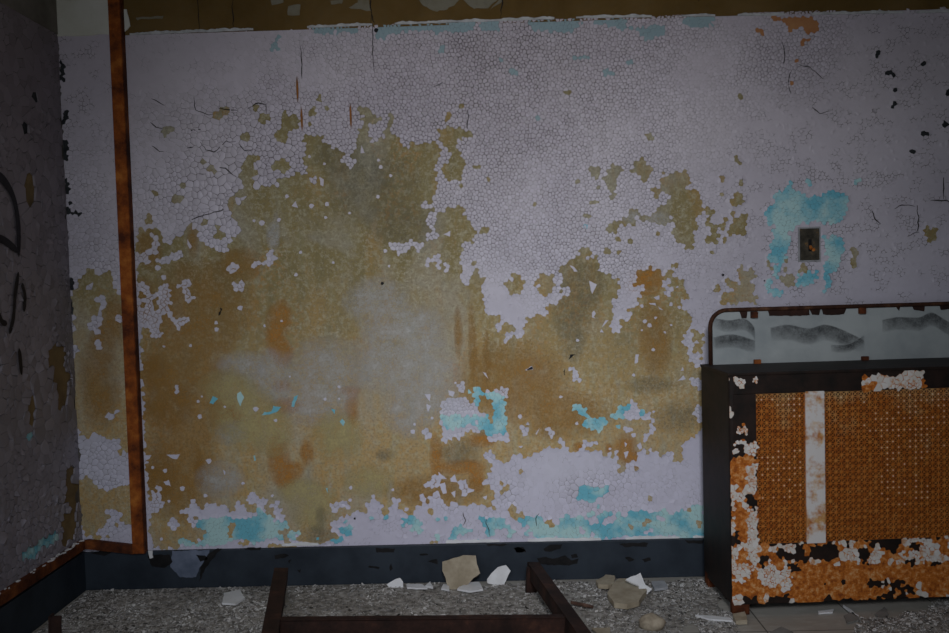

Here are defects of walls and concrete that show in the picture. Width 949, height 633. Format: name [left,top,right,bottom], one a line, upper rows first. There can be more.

crack [368,0,376,67]
spalling [124,0,949,88]
peeling [12,159,42,226]
peeling [134,89,865,606]
peeling [861,370,925,391]
peeling [832,535,949,566]
peeling [906,581,928,598]